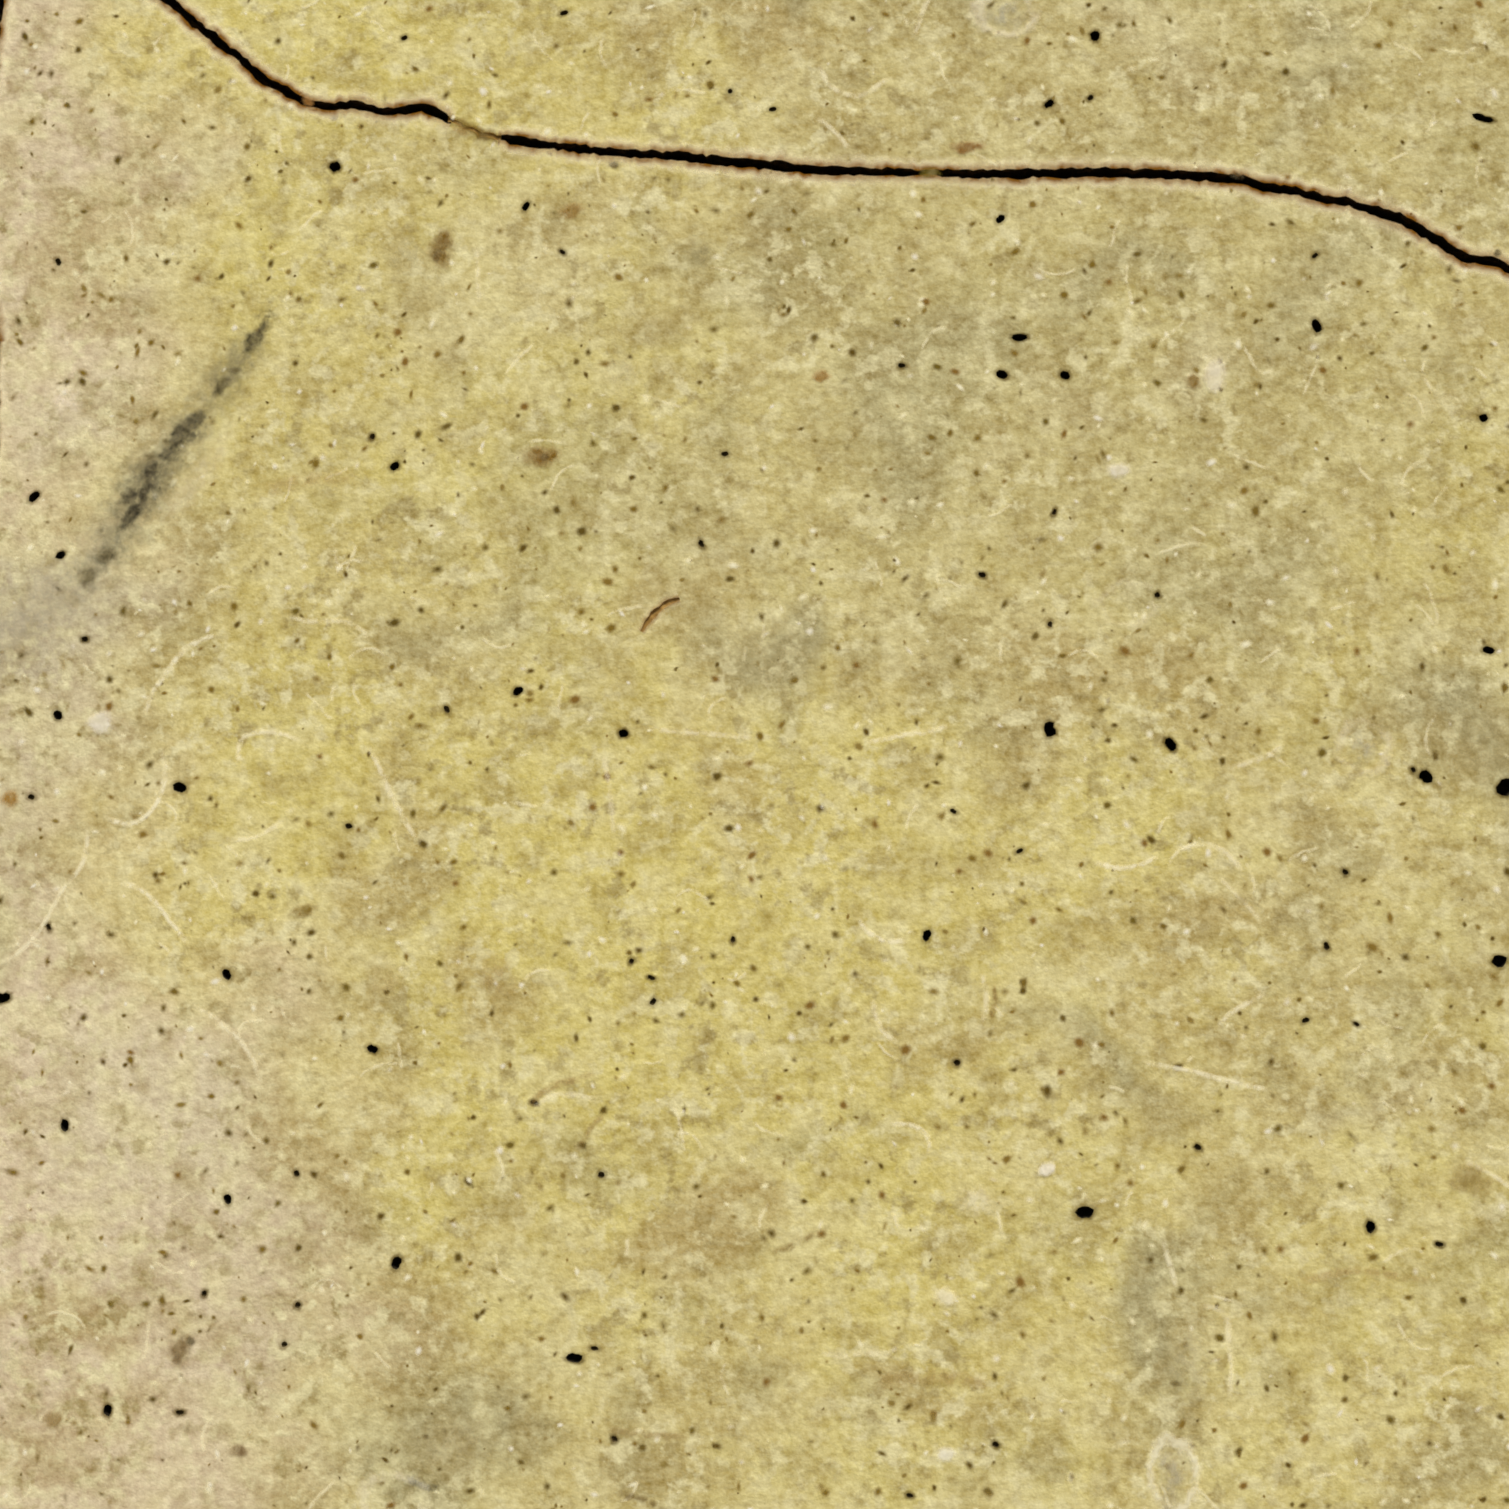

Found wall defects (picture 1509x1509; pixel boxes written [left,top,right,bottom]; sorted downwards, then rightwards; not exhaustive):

crack [0,0,8,66]
crack [160,0,1509,277]